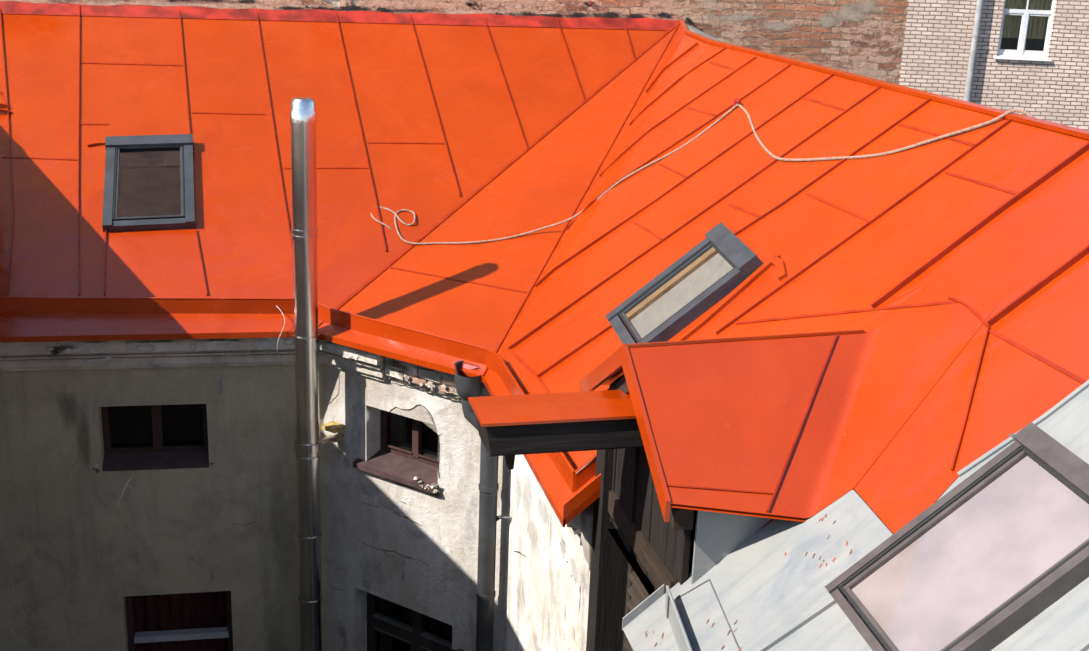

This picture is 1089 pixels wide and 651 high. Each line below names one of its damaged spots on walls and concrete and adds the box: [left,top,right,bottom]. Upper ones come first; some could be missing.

spalling [385,357,458,496]